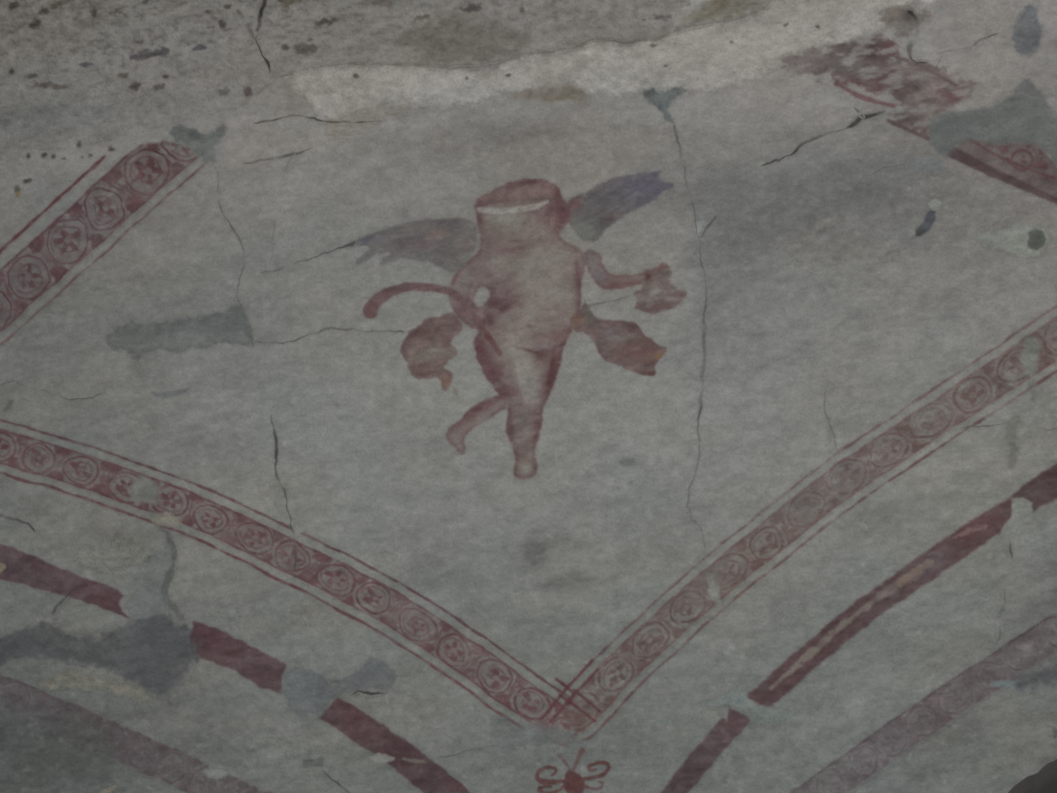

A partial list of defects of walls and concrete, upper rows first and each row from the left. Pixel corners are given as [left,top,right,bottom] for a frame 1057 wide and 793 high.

crack [236,0,272,73]
flaking render [279,0,945,145]
crack [760,107,887,167]
crack [671,125,718,549]
crack [268,415,299,570]